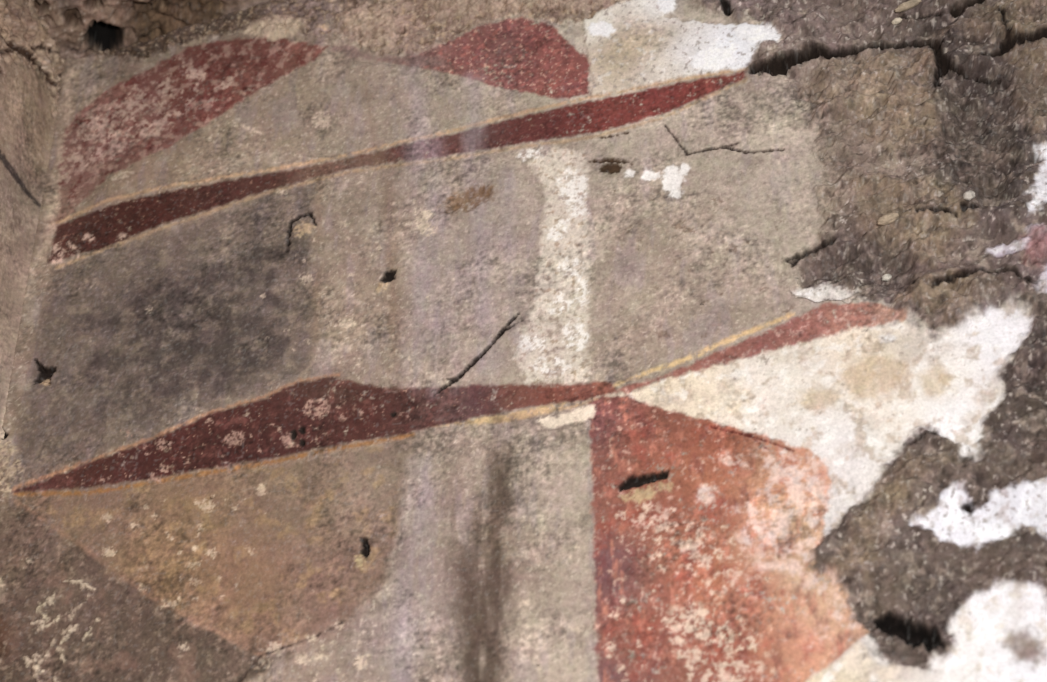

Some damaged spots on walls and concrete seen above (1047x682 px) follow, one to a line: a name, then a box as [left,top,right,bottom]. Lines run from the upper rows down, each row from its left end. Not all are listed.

spalling [0,0,110,125]
spalling [61,0,1047,191]
crack [662,123,786,157]
crack [745,0,1047,92]
peeling [47,231,97,268]
water stain [356,65,538,404]
peeling [510,146,597,390]
peeling [221,395,379,459]
crack [431,311,525,397]
peeling [535,403,598,430]
spalling [612,38,1047,682]
water stain [379,401,529,682]